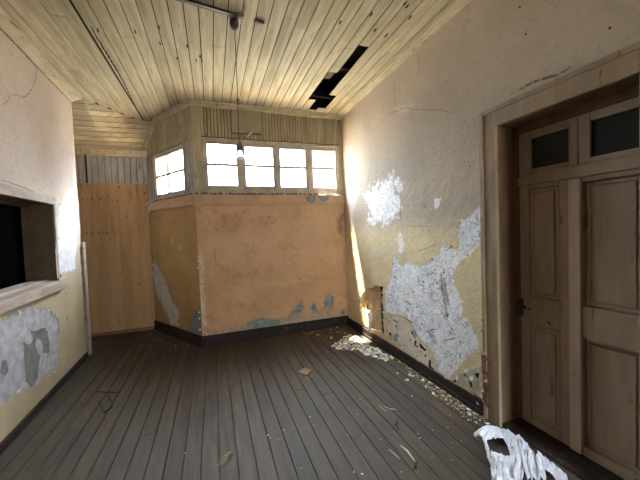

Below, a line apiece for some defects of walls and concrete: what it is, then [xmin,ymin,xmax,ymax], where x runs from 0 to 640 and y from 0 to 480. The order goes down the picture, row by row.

crack [0,28,71,106]
peeling [55,104,79,278]
peeling [0,299,68,414]
peeling [152,256,181,328]
peeling [279,292,347,325]
peeling [343,164,489,408]